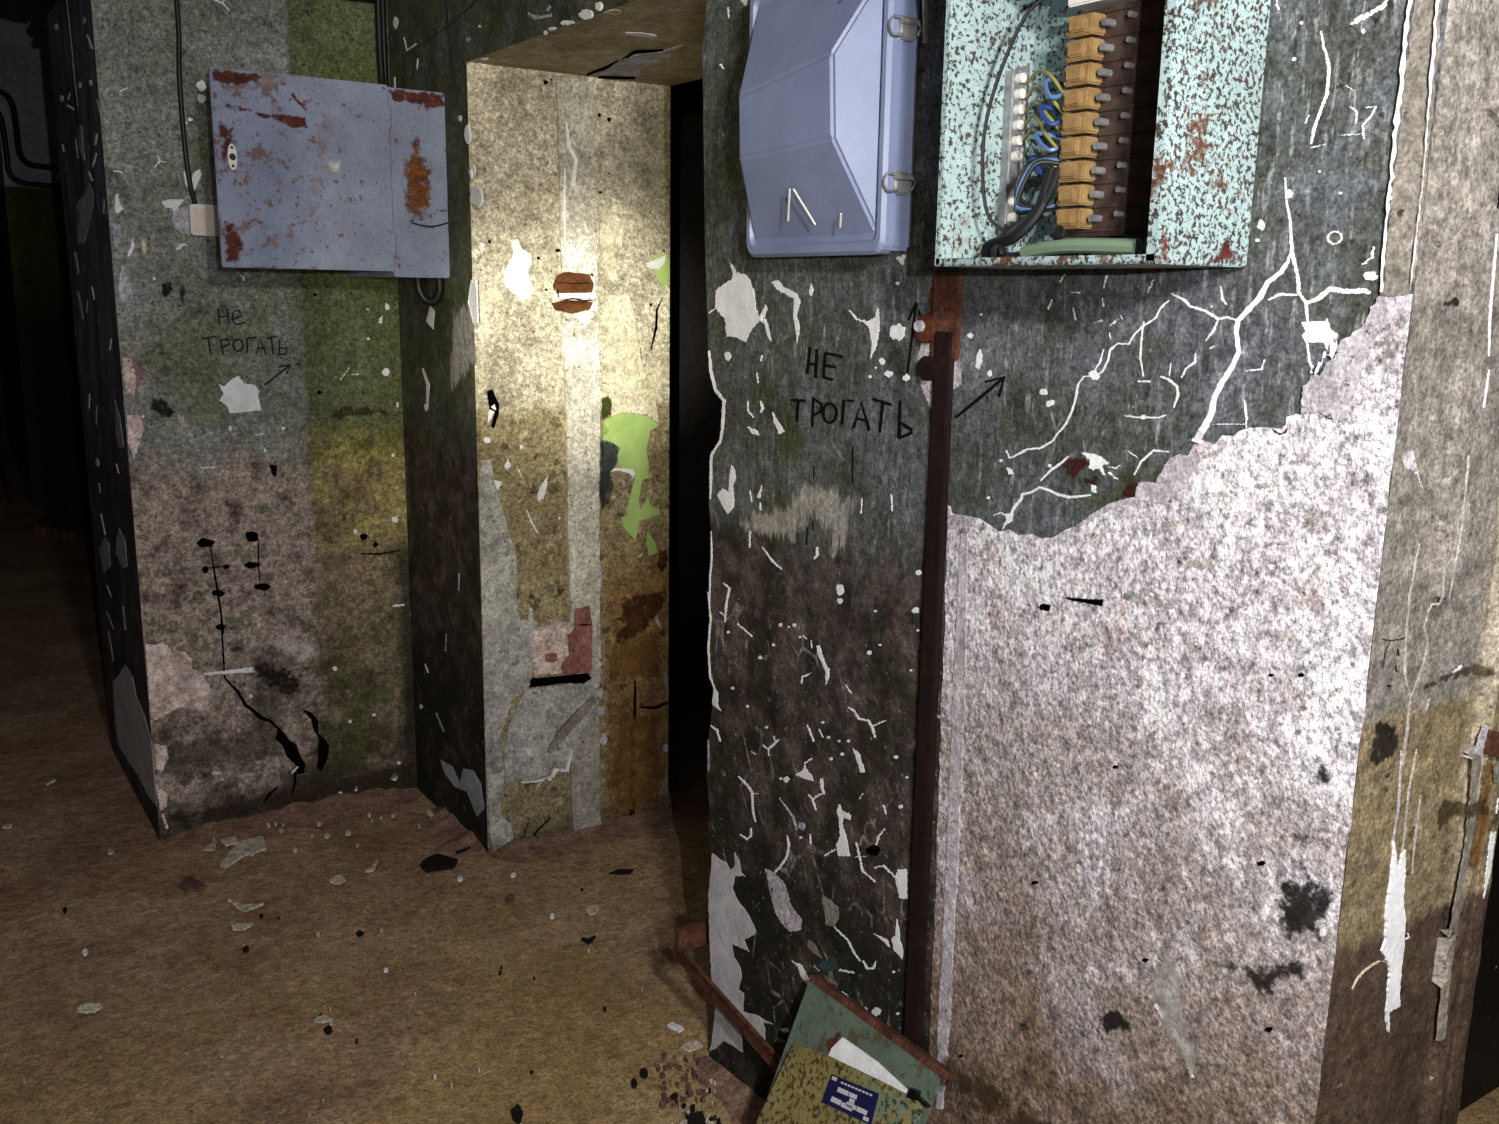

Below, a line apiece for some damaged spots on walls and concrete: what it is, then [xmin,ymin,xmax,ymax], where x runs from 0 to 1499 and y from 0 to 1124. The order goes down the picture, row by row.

crack [1310,31,1377,148]
peeling [468,122,661,557]
flaking render [708,262,772,514]
crack [994,177,1371,529]
crack [196,531,329,803]
flaking render [440,389,608,850]
peeling [707,531,753,771]
peeling [758,623,886,738]
flaking render [926,0,1443,1124]
peeling [708,776,789,1052]
peeling [765,721,908,985]
peeling [1432,724,1499,1041]